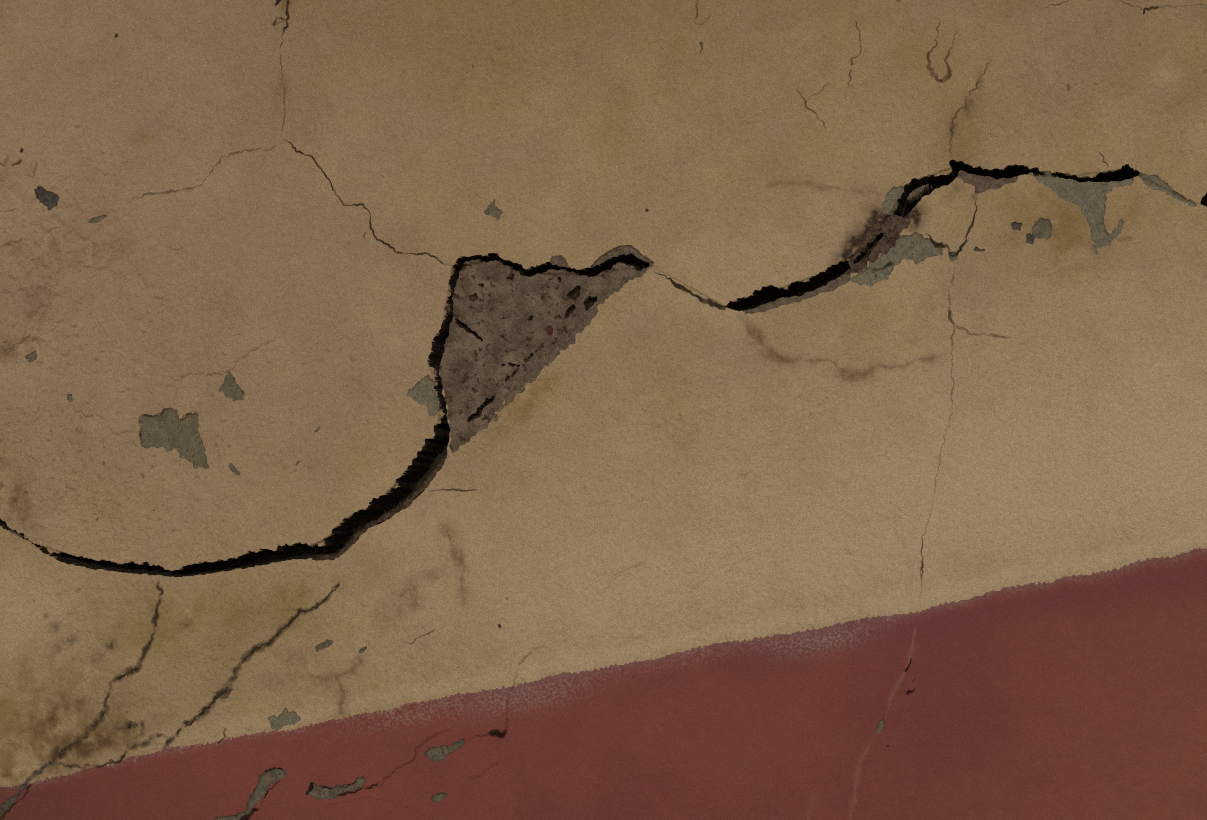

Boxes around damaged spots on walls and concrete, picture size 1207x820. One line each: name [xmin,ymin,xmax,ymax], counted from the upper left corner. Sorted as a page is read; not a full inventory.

crack [273,0,290,81]
crack [927,38,955,82]
spalling [34,186,59,210]
spalling [957,170,1018,194]
spalling [1011,217,1052,244]
peeling [1033,171,1197,255]
crack [1199,193,1207,207]
spalling [407,245,654,453]
peeling [139,408,209,469]
crack [0,143,1140,820]
peeling [213,767,288,820]
peeling [305,776,378,800]